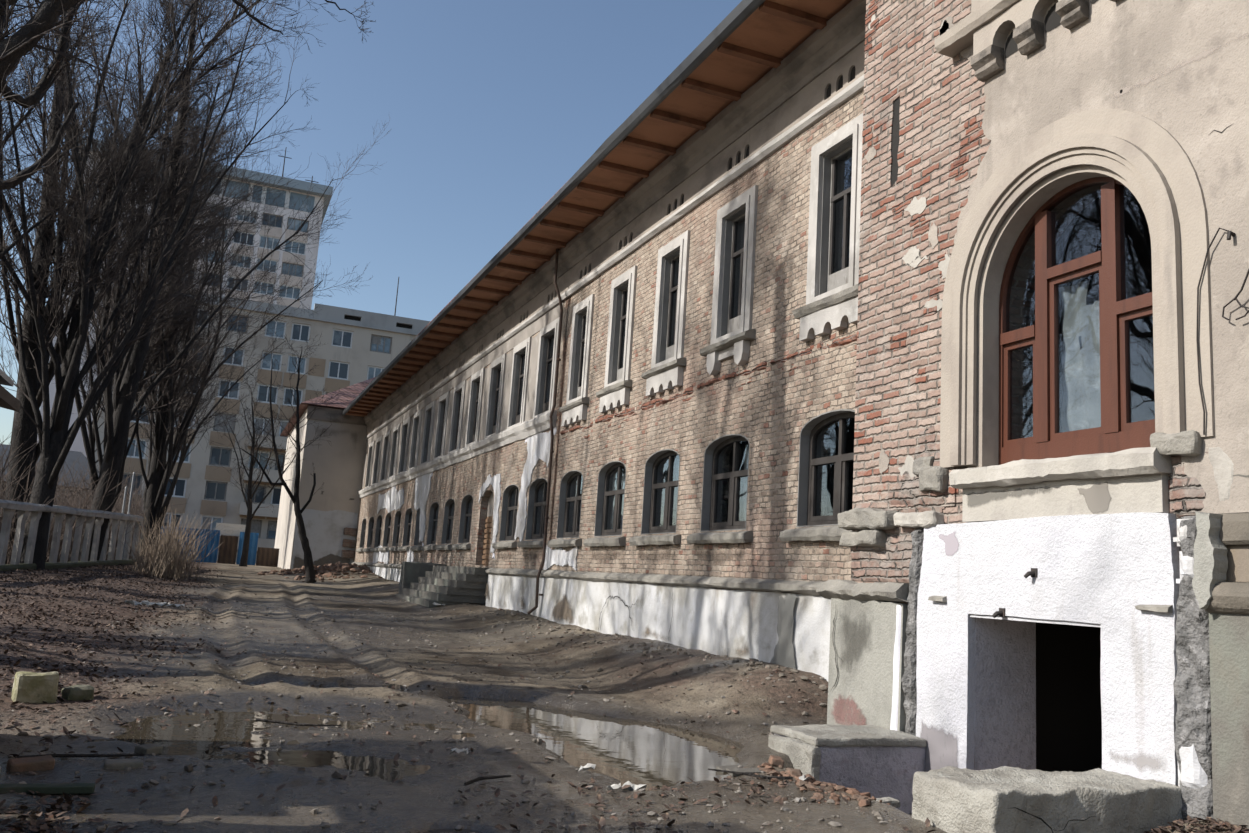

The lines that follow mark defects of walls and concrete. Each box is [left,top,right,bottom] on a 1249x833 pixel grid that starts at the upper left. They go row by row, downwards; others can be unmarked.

crack [598,585,635,630]
damp [842,620,866,663]
flaking render [1170,447,1234,821]